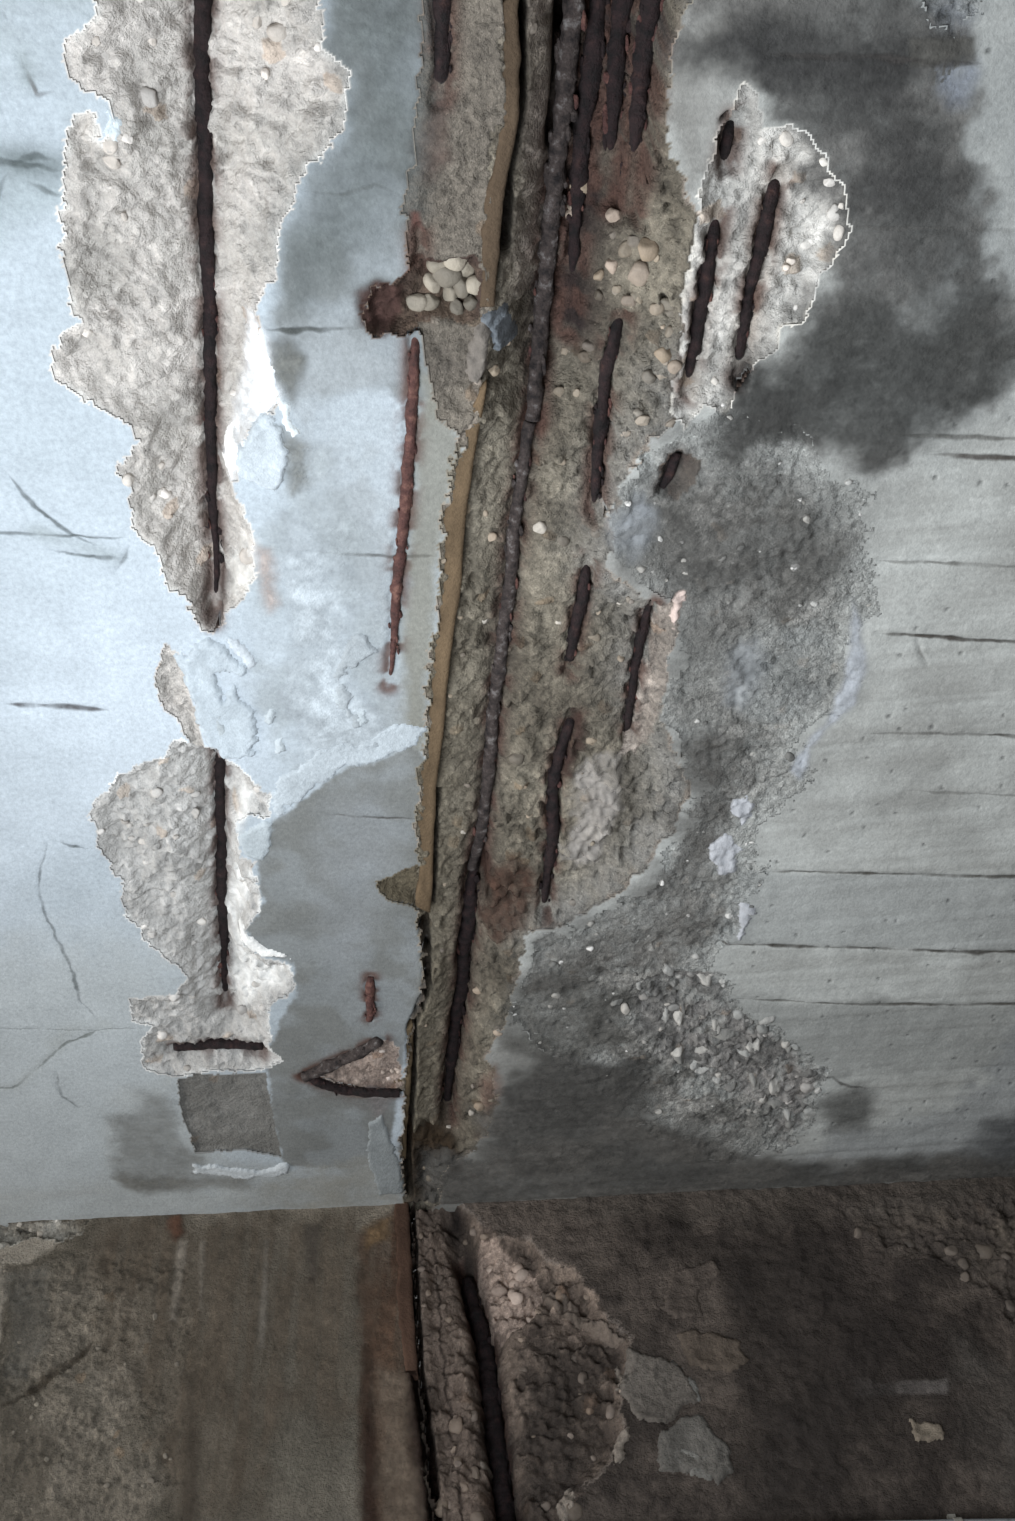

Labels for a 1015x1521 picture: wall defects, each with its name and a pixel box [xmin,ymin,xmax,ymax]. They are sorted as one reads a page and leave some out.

damp [688,0,1015,470]
corrosion [357,282,401,333]
crack [938,435,1015,460]
crack [24,496,94,557]
spalling [51,0,882,1180]
crack [900,634,1015,642]
crack [964,872,1015,880]
crack [725,941,812,949]
crack [927,948,1015,956]
damp [419,982,1015,1204]
corrosion [401,1114,459,1203]
spalling [365,1114,750,1521]